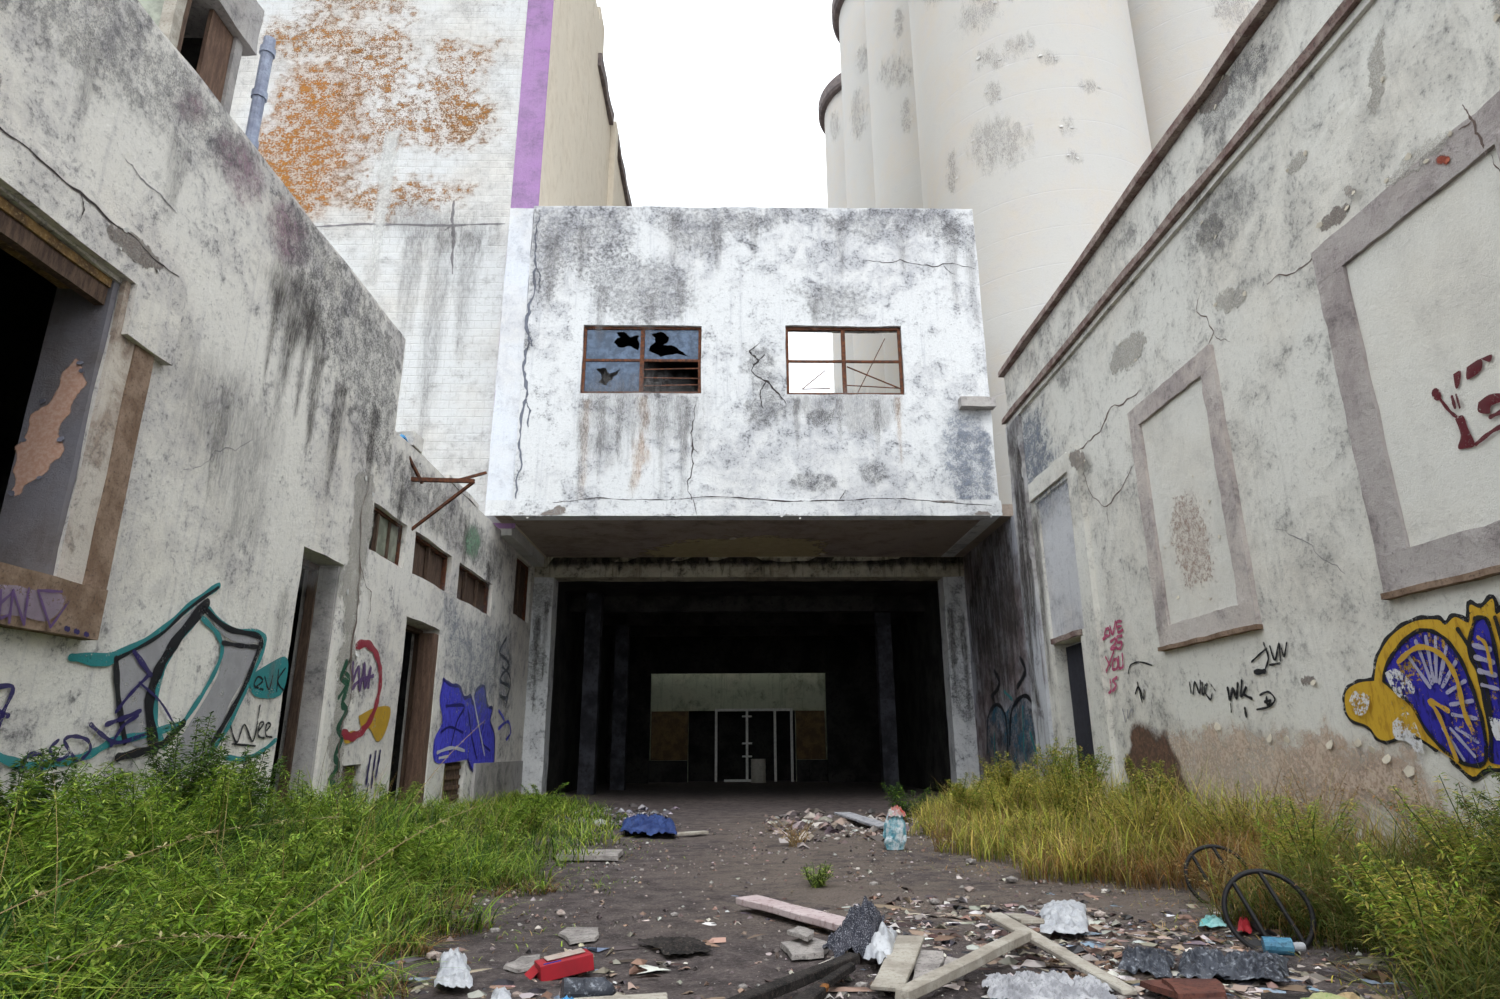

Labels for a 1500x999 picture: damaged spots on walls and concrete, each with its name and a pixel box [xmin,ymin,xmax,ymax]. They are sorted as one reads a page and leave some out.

corrosion [258,0,501,221]
crack [0,127,179,277]
peeling [7,358,87,496]
water stain [266,131,502,597]
crack [316,200,541,499]
crack [749,343,786,408]
crack [553,405,992,514]
water stain [1125,723,1189,810]